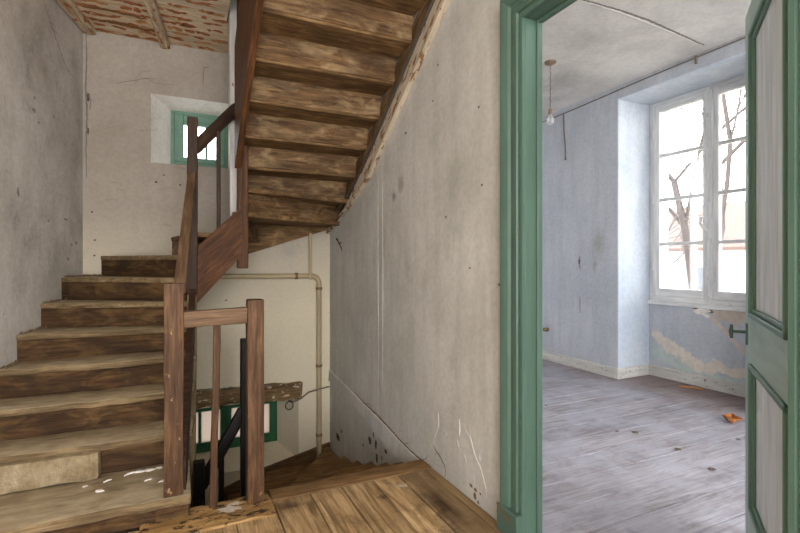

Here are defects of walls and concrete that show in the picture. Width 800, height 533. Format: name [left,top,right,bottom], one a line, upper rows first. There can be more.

peeling [651,328,745,385]
peeling [693,302,745,355]